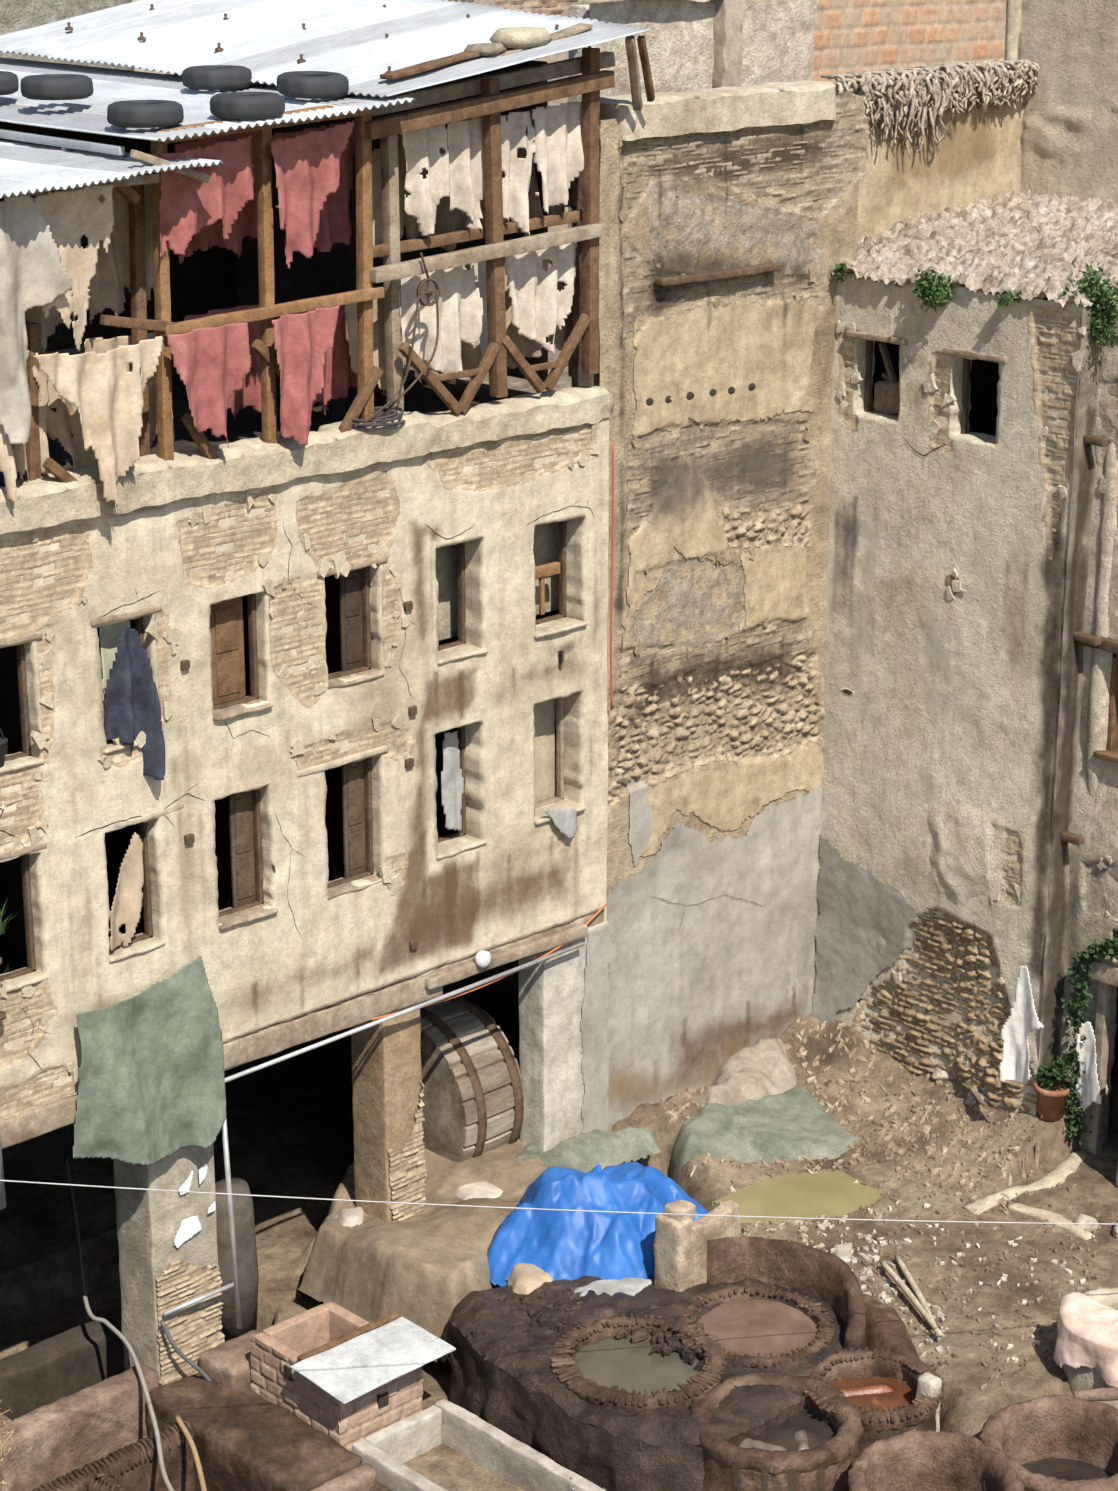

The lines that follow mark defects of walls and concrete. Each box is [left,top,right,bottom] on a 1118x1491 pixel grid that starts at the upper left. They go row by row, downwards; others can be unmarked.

water stain [656,445,792,511]
flaking render [1027,305,1118,560]
flaking render [177,470,409,708]
water stain [415,528,435,616]
water stain [424,672,472,720]
water stain [1030,407,1095,1067]
water stain [381,786,563,970]
flaking render [0,978,81,1120]